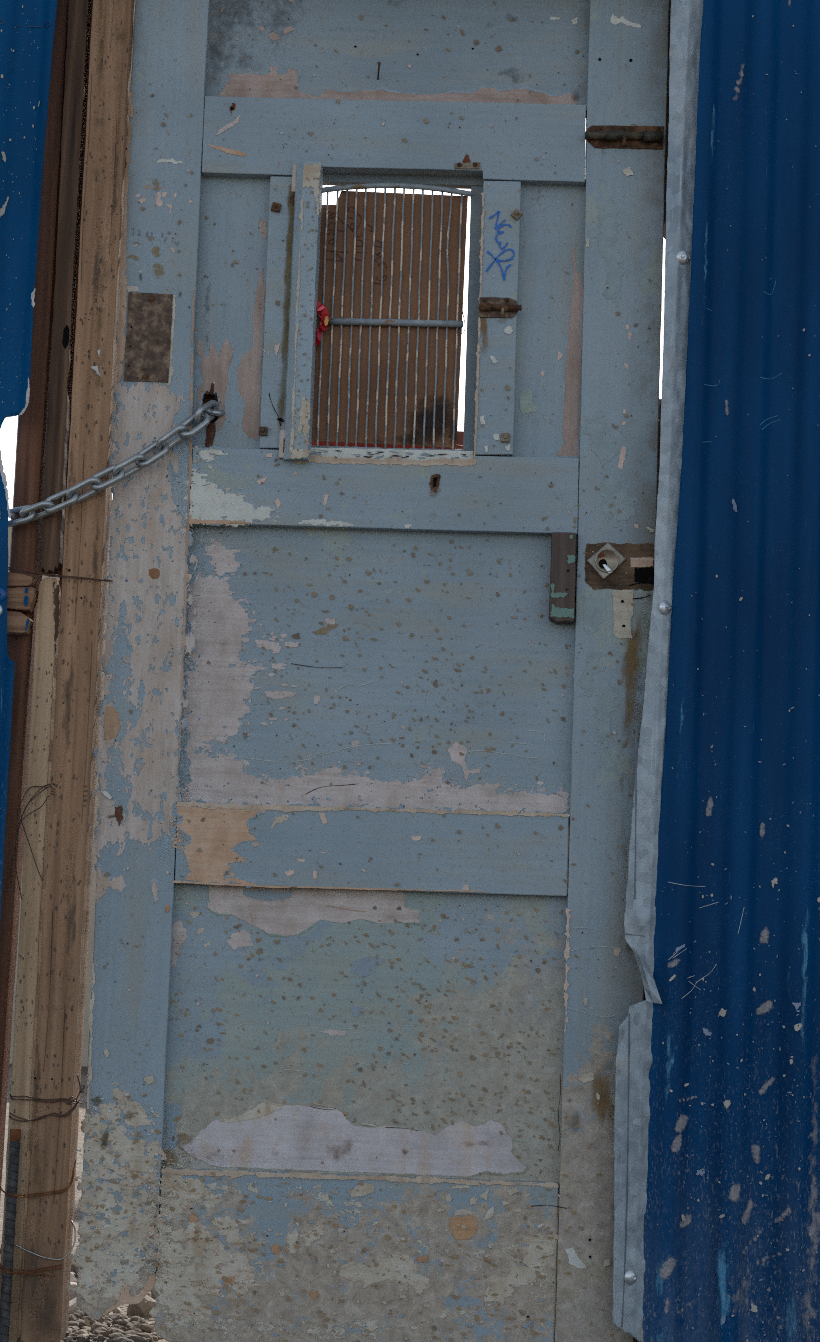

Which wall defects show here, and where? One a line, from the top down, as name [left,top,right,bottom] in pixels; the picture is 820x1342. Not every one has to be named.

peeling [557,236,596,458]
peeling [78,163,570,967]
peeling [67,1074,586,1341]